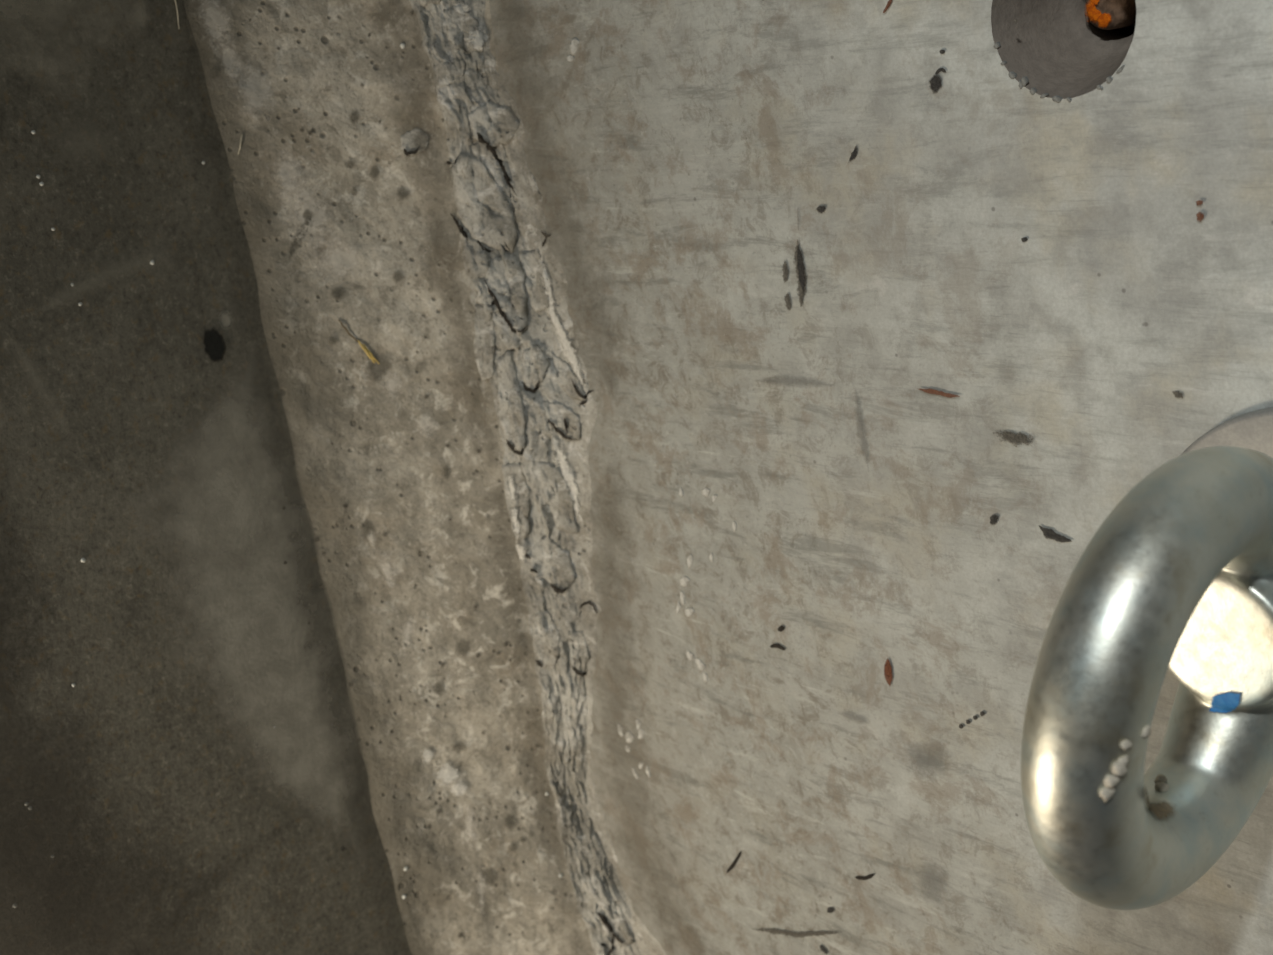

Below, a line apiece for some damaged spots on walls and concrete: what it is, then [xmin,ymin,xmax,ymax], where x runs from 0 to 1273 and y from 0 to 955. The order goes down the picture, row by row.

corrosion [1085,0,1111,28]
crack [404,147,419,156]
crack [477,132,517,196]
crack [451,214,526,333]
crack [522,380,540,393]
crack [548,381,594,440]
crack [506,440,524,455]
crack [525,554,597,613]
water stain [164,395,354,828]
crack [536,660,587,677]
crack [597,912,628,955]